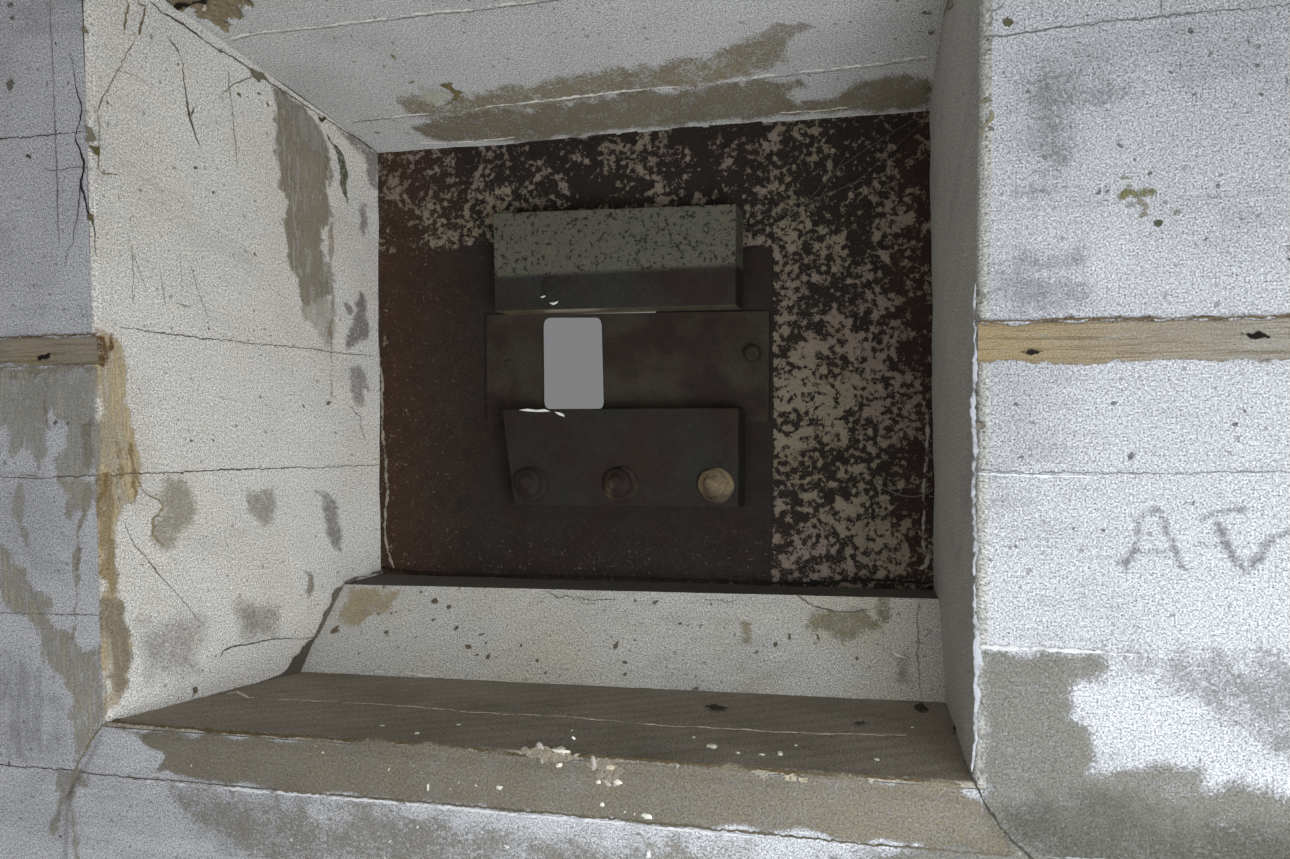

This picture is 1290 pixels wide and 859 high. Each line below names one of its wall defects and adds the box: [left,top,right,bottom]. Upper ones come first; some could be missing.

crack [0,7,147,267]
spalling [169,0,254,33]
crack [150,1,376,169]
water stain [272,87,335,344]
rust [569,131,638,144]
water stain [397,23,933,143]
rust [671,121,764,146]
water stain [0,364,103,586]
water stain [0,546,106,859]
crack [0,721,527,792]
water stain [122,650,1290,859]
crack [572,753,1033,859]